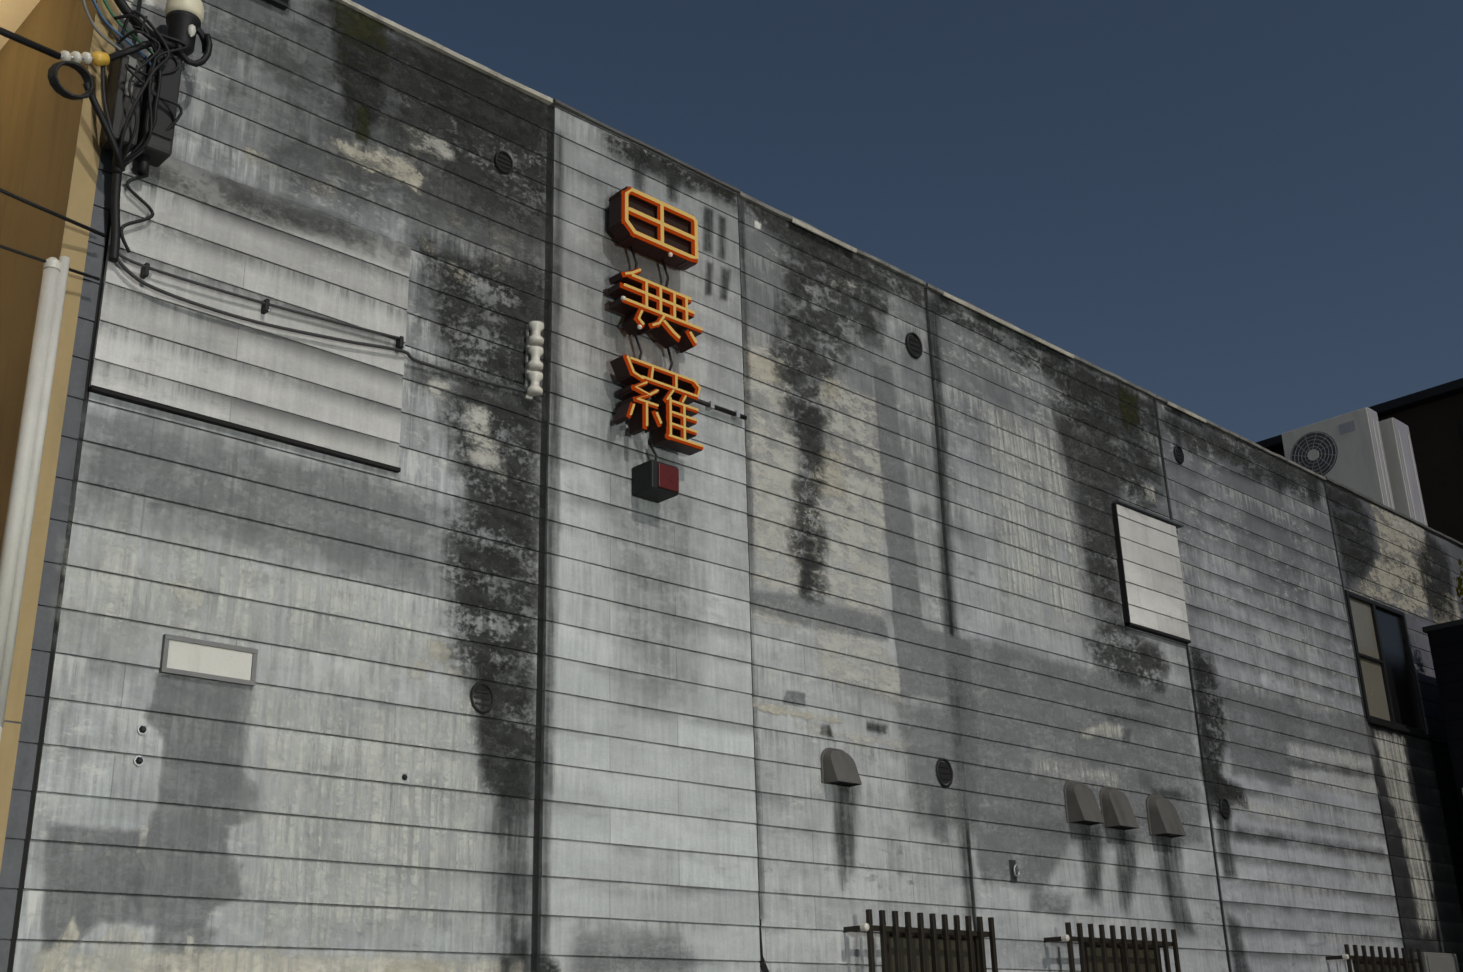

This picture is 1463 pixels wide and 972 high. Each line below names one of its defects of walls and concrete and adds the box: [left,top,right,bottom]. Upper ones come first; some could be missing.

leakage [45,33,561,972]
leakage [605,132,1456,932]
leakage [577,937,691,972]